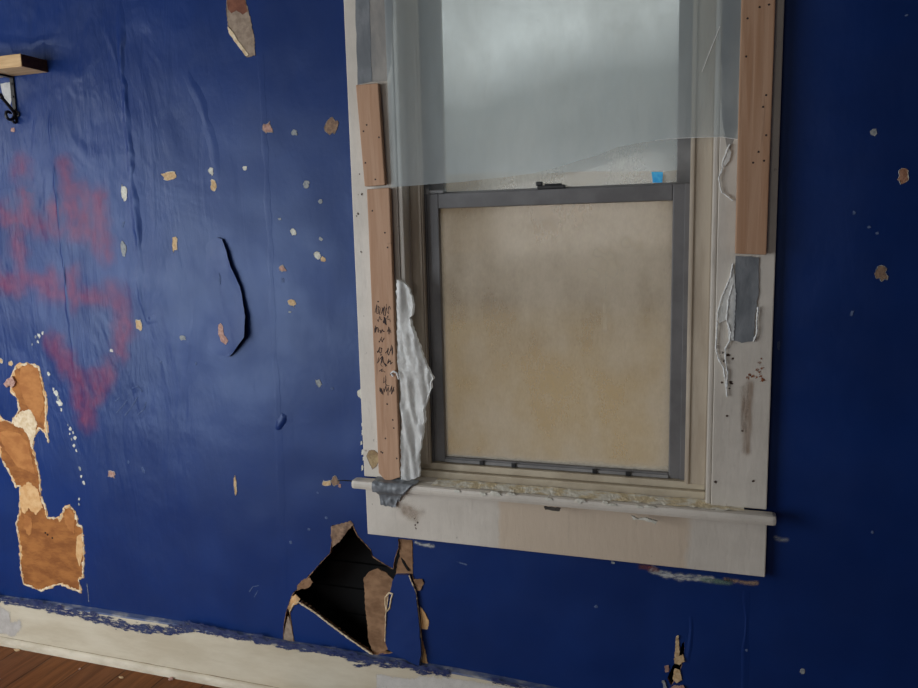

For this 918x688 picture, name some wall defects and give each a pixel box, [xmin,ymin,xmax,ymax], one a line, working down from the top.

peeling [0,358,17,388]
spalling [283,516,429,667]
spalling [662,616,694,688]